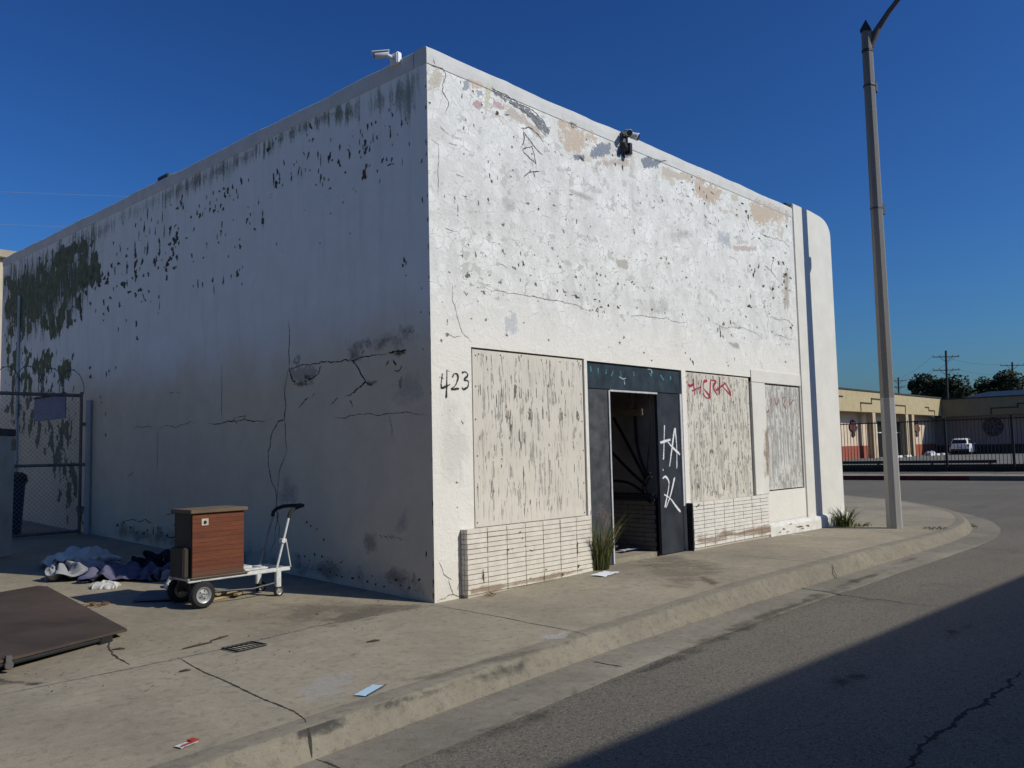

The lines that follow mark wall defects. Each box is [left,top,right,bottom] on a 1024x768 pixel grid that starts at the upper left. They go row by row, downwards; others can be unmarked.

water stain [162,102,360,200]
peeling [452,90,520,157]
crack [494,89,549,177]
peeling [4,104,408,525]
crack [485,264,586,310]
peeling [444,115,795,521]
crack [135,330,424,553]